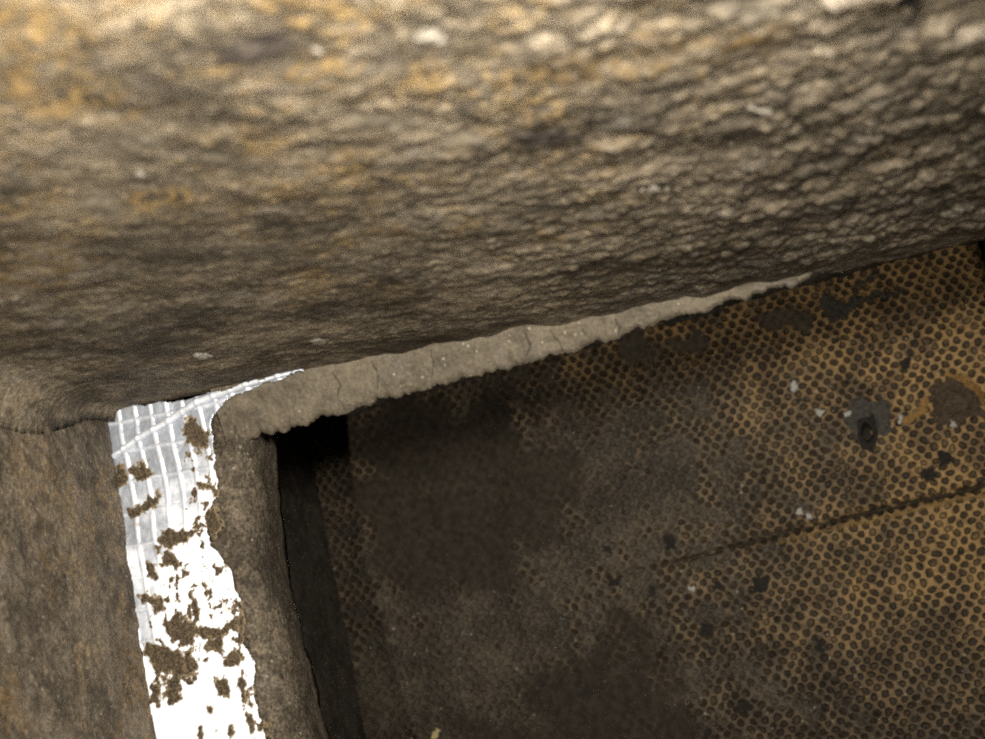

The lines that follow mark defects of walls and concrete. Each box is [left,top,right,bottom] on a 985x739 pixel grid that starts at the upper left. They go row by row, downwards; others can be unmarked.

leakage [331,395,580,592]
leakage [527,611,696,739]